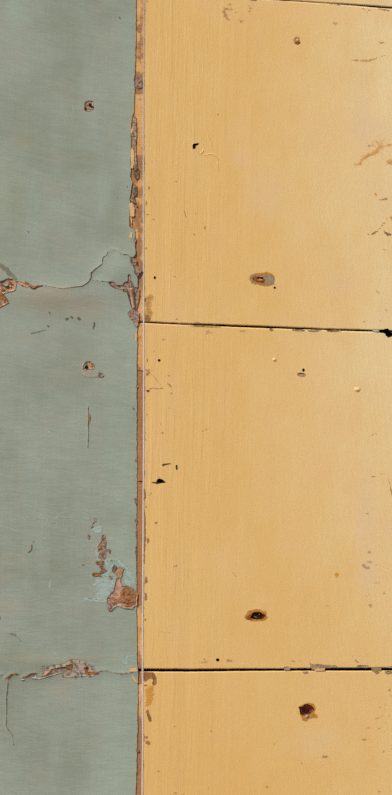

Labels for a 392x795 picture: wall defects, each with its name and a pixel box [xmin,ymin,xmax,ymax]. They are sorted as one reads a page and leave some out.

peeling [0,278,42,307]
crack [49,249,130,289]
corrosion [249,272,274,286]
peeling [83,518,148,611]
corrosion [244,609,268,621]
corrosion [298,703,318,721]